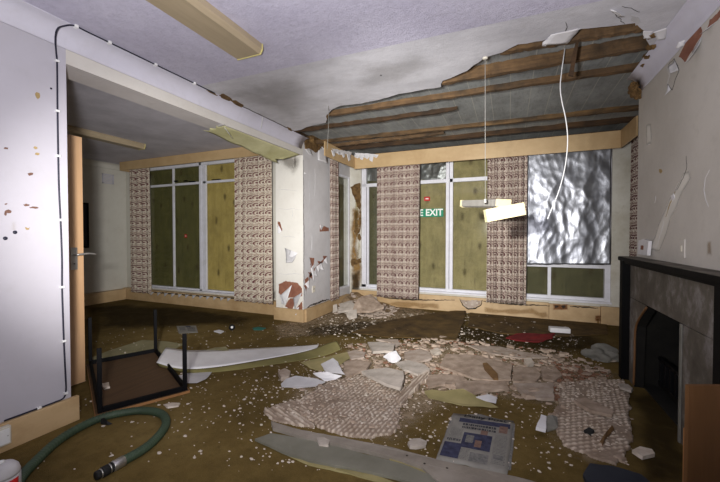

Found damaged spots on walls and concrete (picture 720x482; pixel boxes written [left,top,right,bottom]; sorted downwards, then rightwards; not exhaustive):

peeling [542,26,610,46]
spalling [611,10,667,68]
peeling [668,10,720,74]
spalling [628,80,642,100]
peeling [304,135,379,164]
leakage [351,203,361,290]
peeling [279,256,328,315]